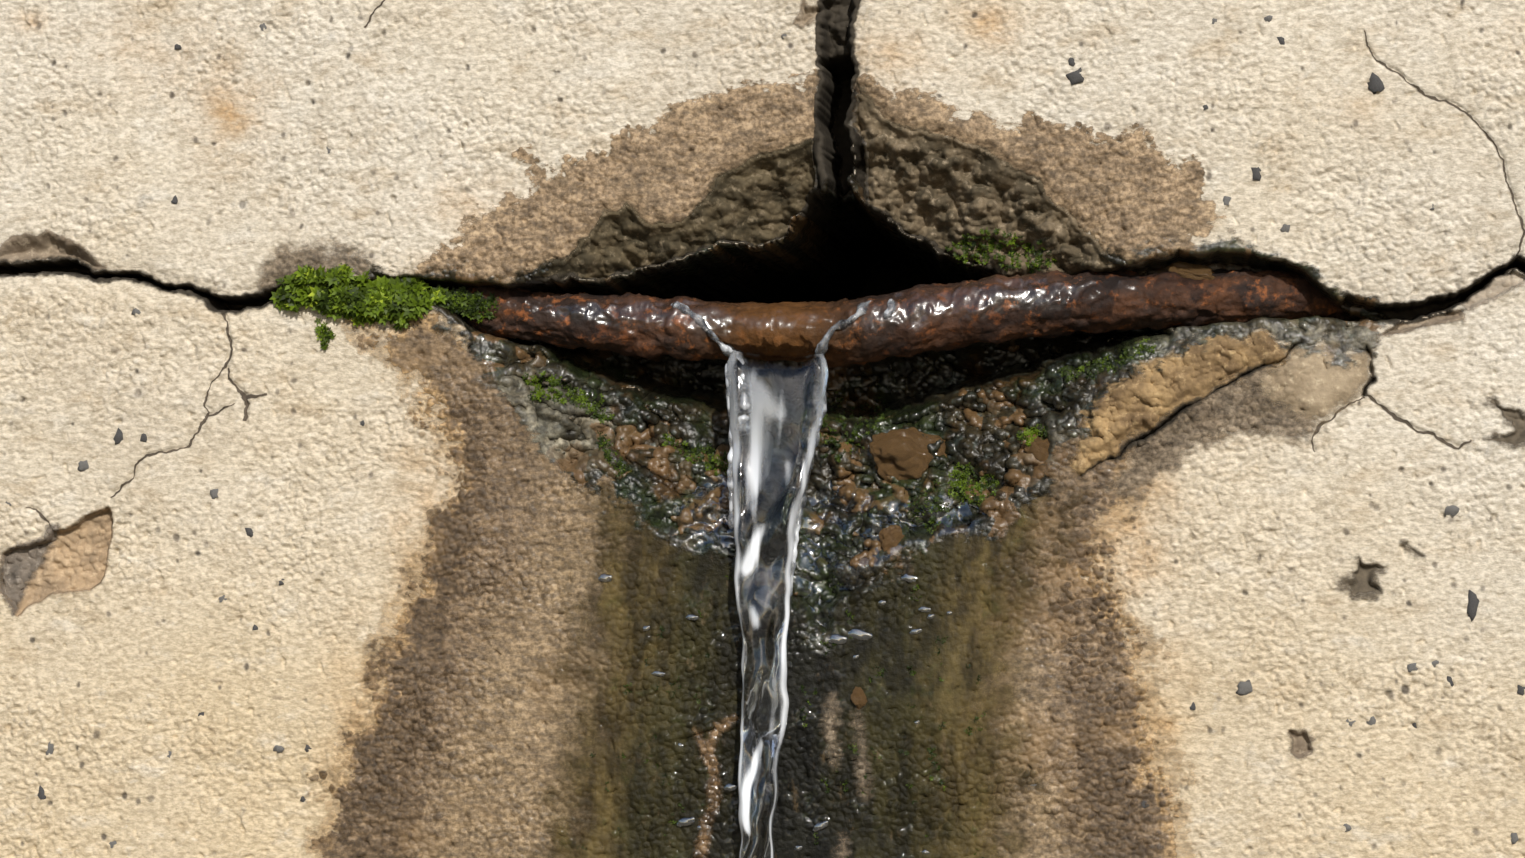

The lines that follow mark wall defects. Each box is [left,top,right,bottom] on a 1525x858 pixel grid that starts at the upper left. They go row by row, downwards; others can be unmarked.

crack [0,256,285,498]
spalling [368,265,396,281]
water stain [408,68,820,285]
crack [812,0,867,200]
spalling [415,80,1525,654]
water stain [837,63,1227,267]
crack [1311,375,1472,452]
crack [1341,30,1525,325]
spalling [0,507,113,616]
water stain [309,312,628,858]
water stain [985,410,1182,858]
spalling [1289,730,1315,759]